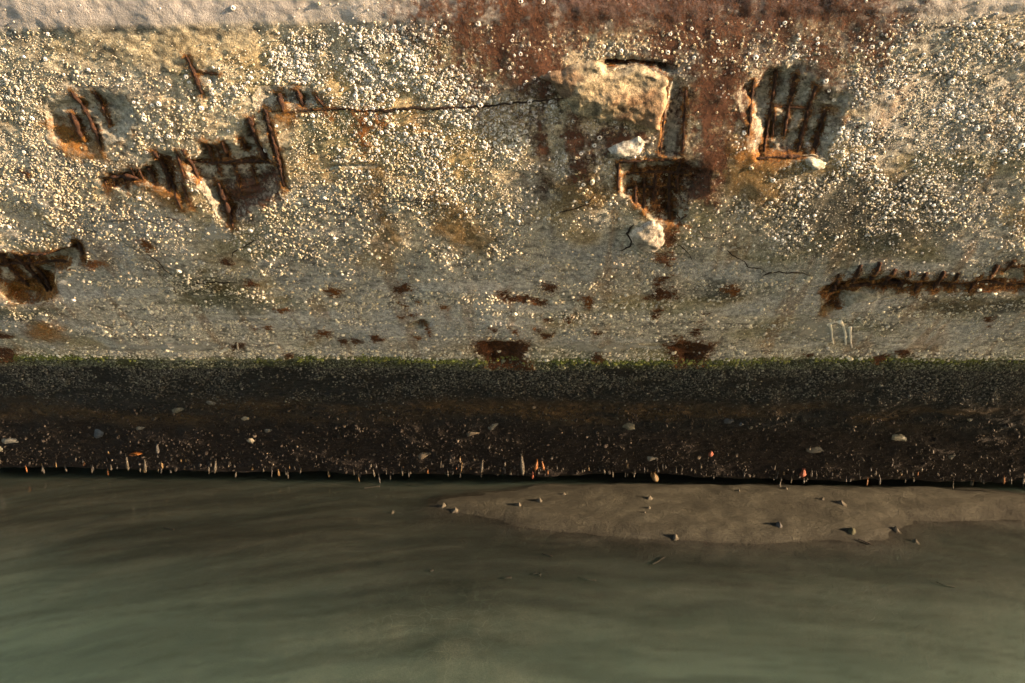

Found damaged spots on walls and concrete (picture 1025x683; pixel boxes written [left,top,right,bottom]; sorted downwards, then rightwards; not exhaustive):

spalling [44,87,138,158]
spalling [94,82,329,235]
crack [272,98,564,114]
spalling [603,58,713,233]
spalling [733,61,855,166]
rust [0,320,69,363]
spalling [0,233,93,307]
rust [312,328,386,346]
rust [390,279,434,341]
rust [469,281,596,372]
rust [662,313,721,369]
spalling [816,259,1025,315]